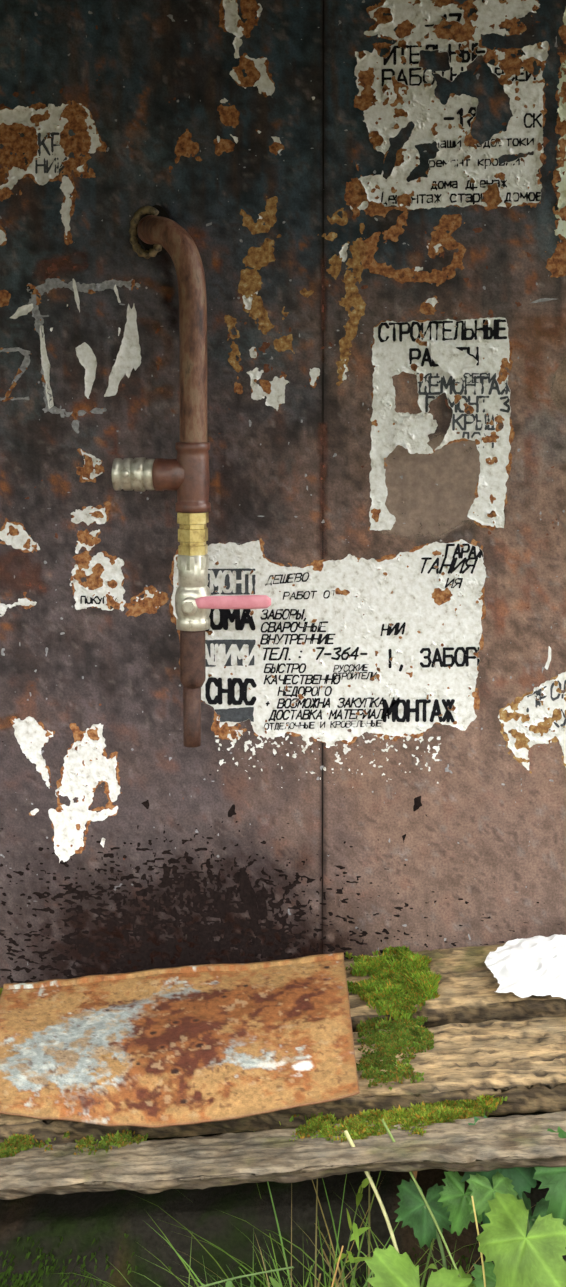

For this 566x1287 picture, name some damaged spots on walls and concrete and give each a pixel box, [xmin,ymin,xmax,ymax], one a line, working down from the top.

peeling [10,266,148,338]
rust [224,196,295,381]
rust [300,209,483,386]
rust [546,241,566,278]
peeling [0,347,107,493]
peeling [55,501,161,635]
rust [123,585,169,617]
peeling [532,646,551,699]